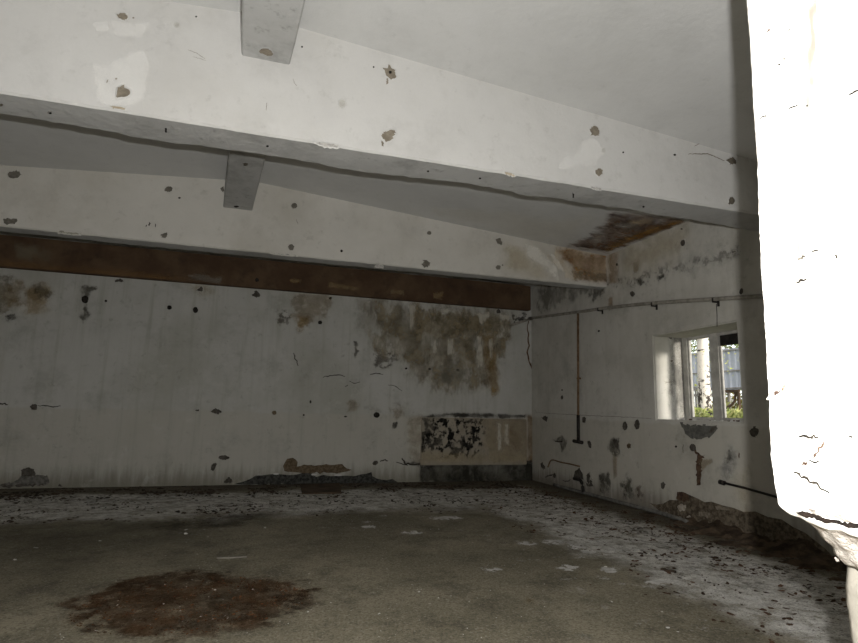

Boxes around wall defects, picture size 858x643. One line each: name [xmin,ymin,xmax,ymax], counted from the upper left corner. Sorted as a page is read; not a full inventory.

spalling [381,62,398,84]
spalling [106,78,132,111]
crack [525,321,533,369]
peeling [421,418,483,458]
spalling [680,422,721,485]
spalling [0,467,61,488]
spalling [223,458,396,485]
crack [793,471,830,494]
spalling [650,492,832,556]
crack [796,511,858,529]